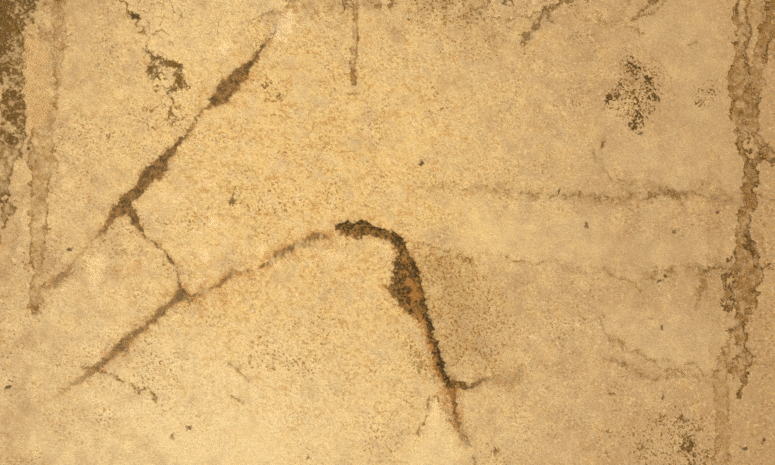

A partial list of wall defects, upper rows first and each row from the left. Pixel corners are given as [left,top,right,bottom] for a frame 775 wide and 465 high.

leakage [0,0,45,228]
peeling [119,0,289,130]
leakage [604,56,662,129]
leakage [27,241,47,314]
crack [83,25,484,423]